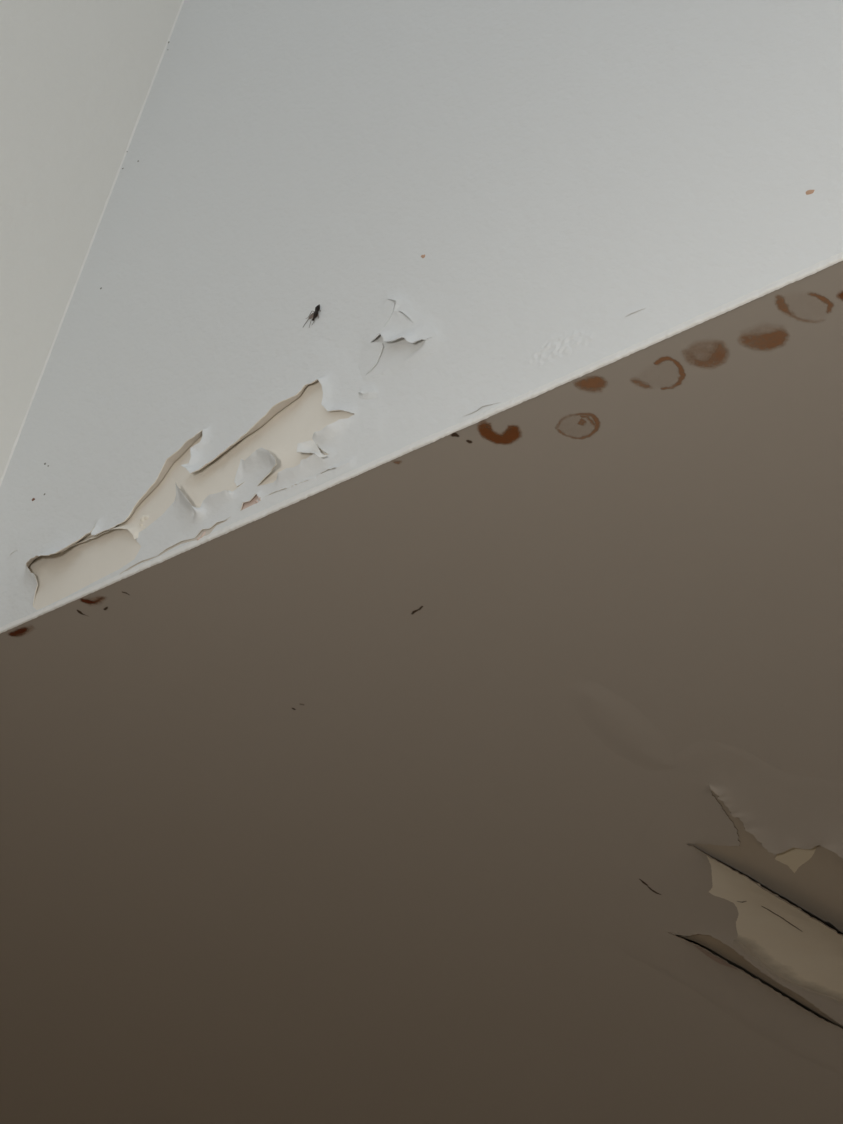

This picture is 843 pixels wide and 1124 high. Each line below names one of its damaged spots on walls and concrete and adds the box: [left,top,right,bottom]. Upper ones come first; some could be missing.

corrosion [776,295,808,321]
corrosion [809,292,843,313]
corrosion [741,330,788,350]
corrosion [631,344,727,390]
corrosion [576,376,606,391]
corrosion [478,422,520,444]
corrosion [557,413,600,439]
peeling [6,286,449,622]
peeling [602,738,843,1076]